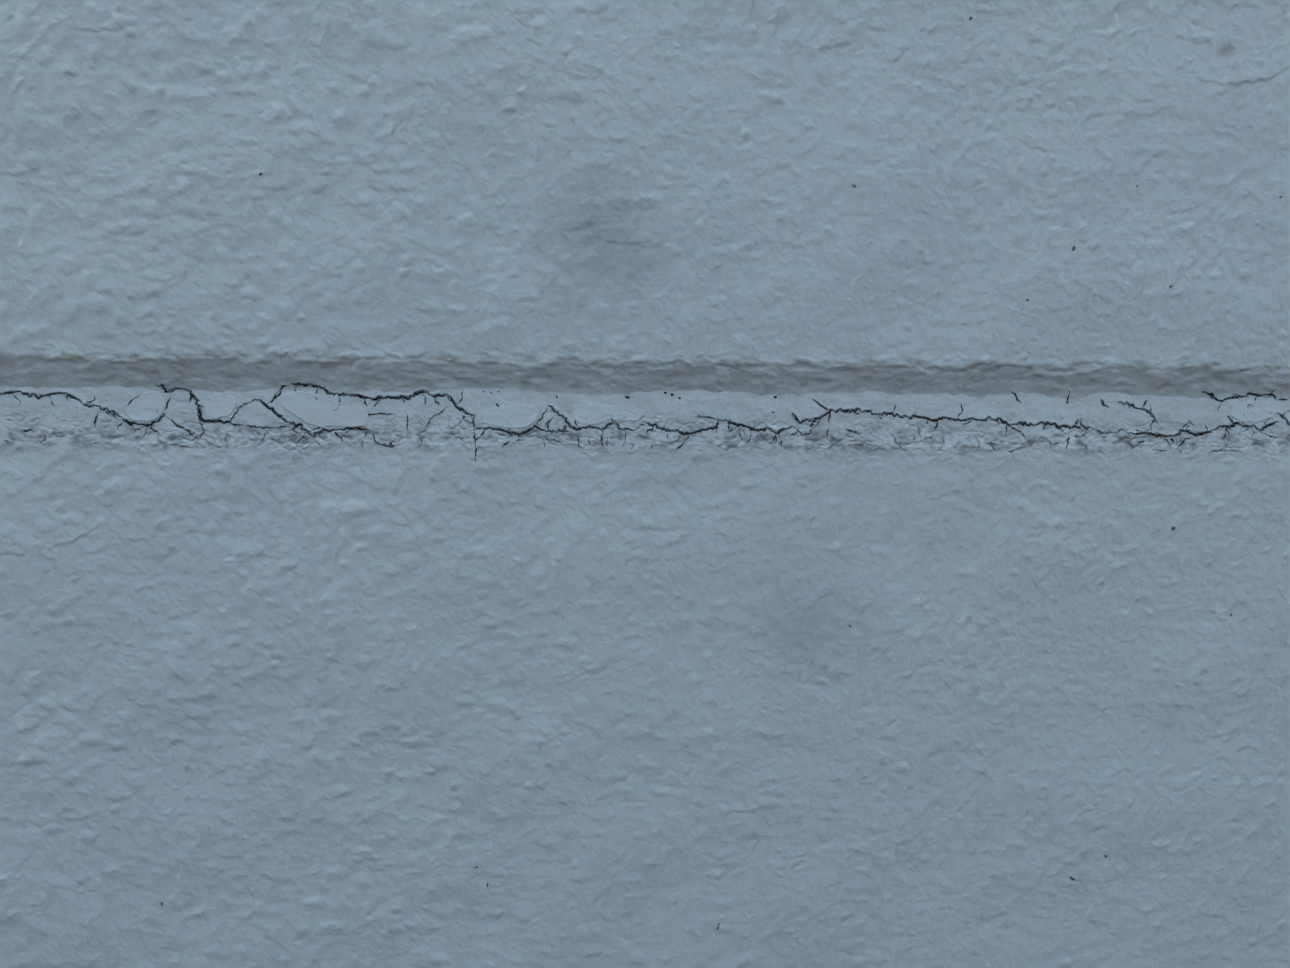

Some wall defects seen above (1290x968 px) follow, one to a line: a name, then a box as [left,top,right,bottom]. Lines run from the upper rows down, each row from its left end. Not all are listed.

crack [0,383,1290,459]